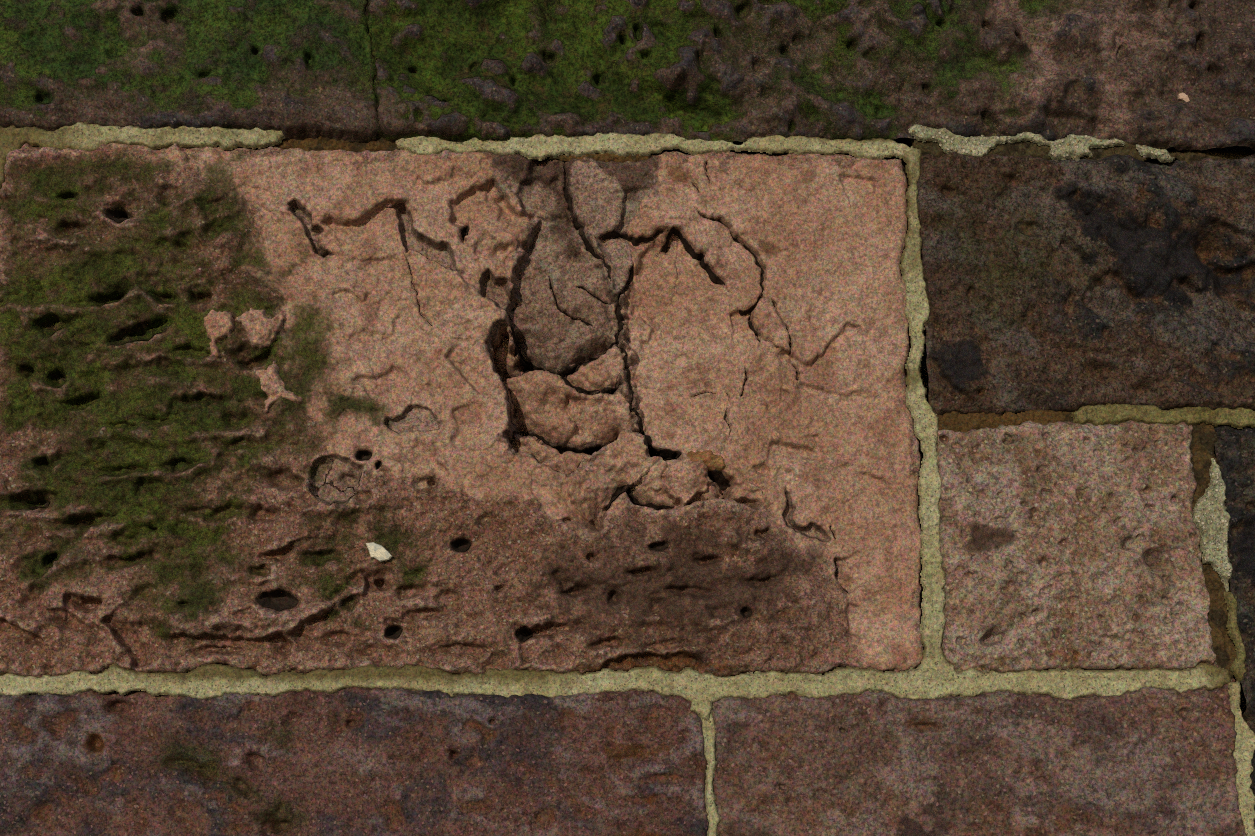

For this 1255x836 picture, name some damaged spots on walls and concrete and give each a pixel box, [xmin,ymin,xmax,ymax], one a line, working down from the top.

crack [404,255,432,326]
spalling [110,135,923,673]
crack [548,162,798,457]